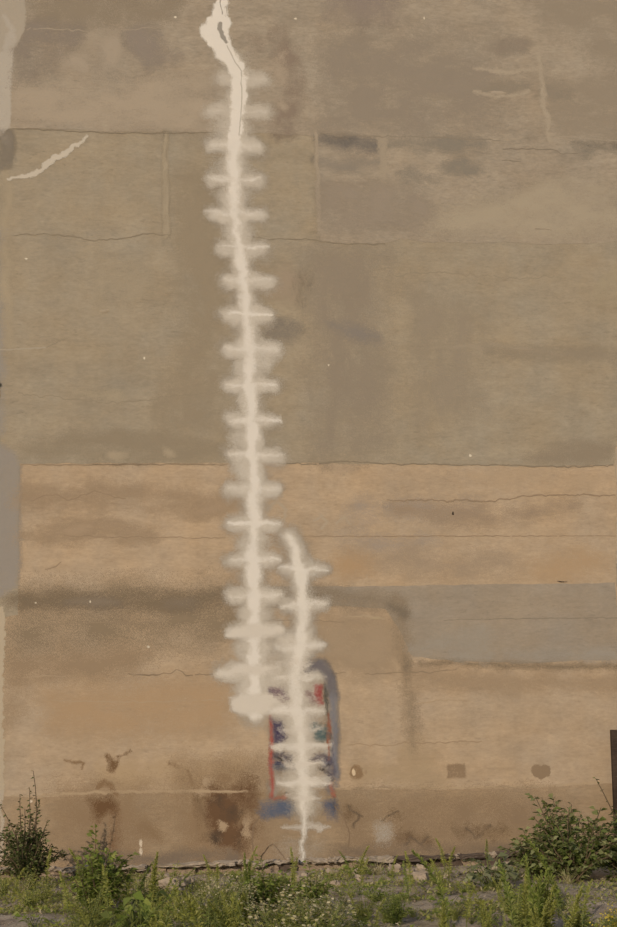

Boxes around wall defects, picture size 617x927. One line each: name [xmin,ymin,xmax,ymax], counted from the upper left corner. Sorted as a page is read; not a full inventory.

crack [226,45,243,135]
damp [0,158,617,760]
crack [269,532,608,540]
crack [391,493,616,503]
damp [40,746,286,873]